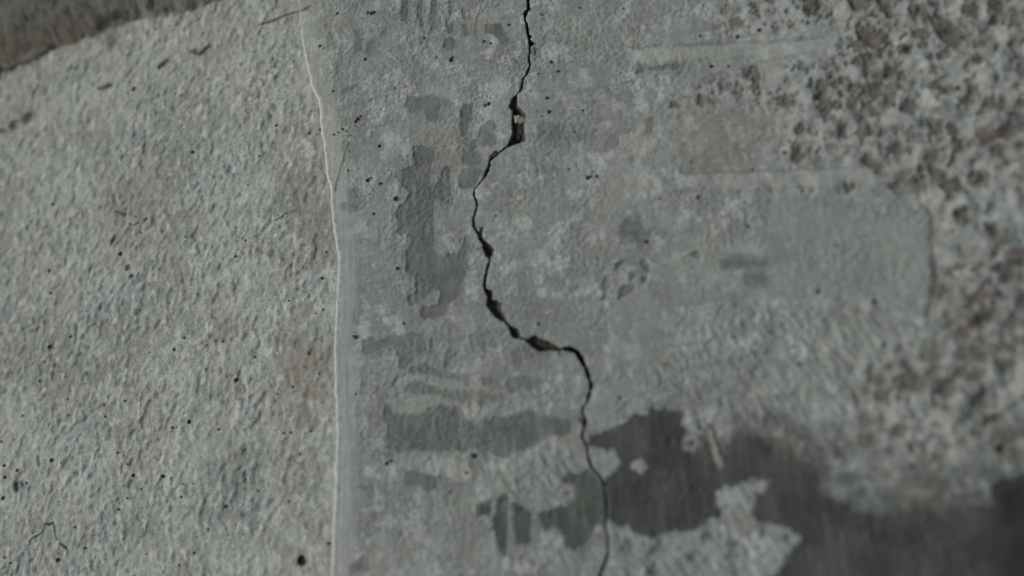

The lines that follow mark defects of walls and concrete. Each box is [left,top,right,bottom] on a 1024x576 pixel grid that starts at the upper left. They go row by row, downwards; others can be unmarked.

crack [471,0,612,576]
water stain [986,472,1024,576]